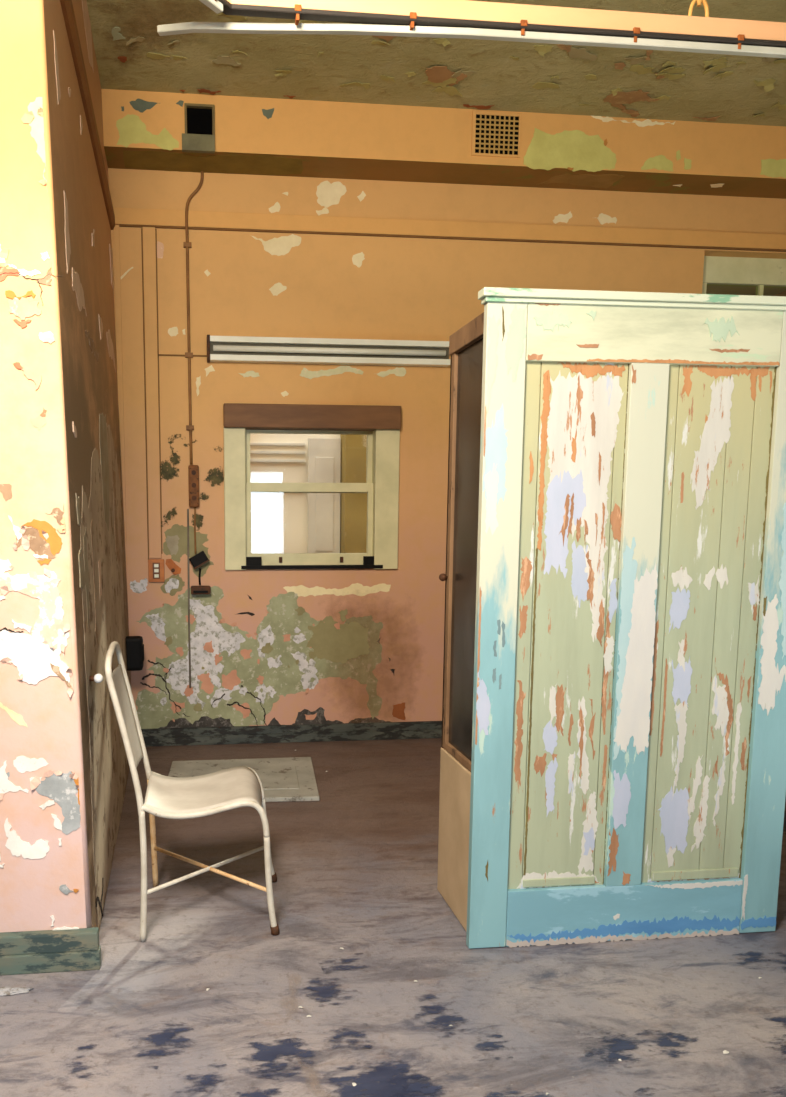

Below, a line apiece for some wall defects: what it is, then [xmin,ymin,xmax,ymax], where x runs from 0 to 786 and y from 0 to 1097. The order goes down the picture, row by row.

peeling [53,30,71,105]
peeling [523,128,624,189]
peeling [250,234,301,256]
spalling [0,244,52,328]
crack [0,272,60,303]
peeling [0,413,406,931]
leakage [306,953,366,1006]
leakage [416,994,465,1037]
leakage [137,1023,193,1069]
leakage [236,1038,315,1097]
leakage [328,1061,444,1097]
leakage [585,1030,697,1064]